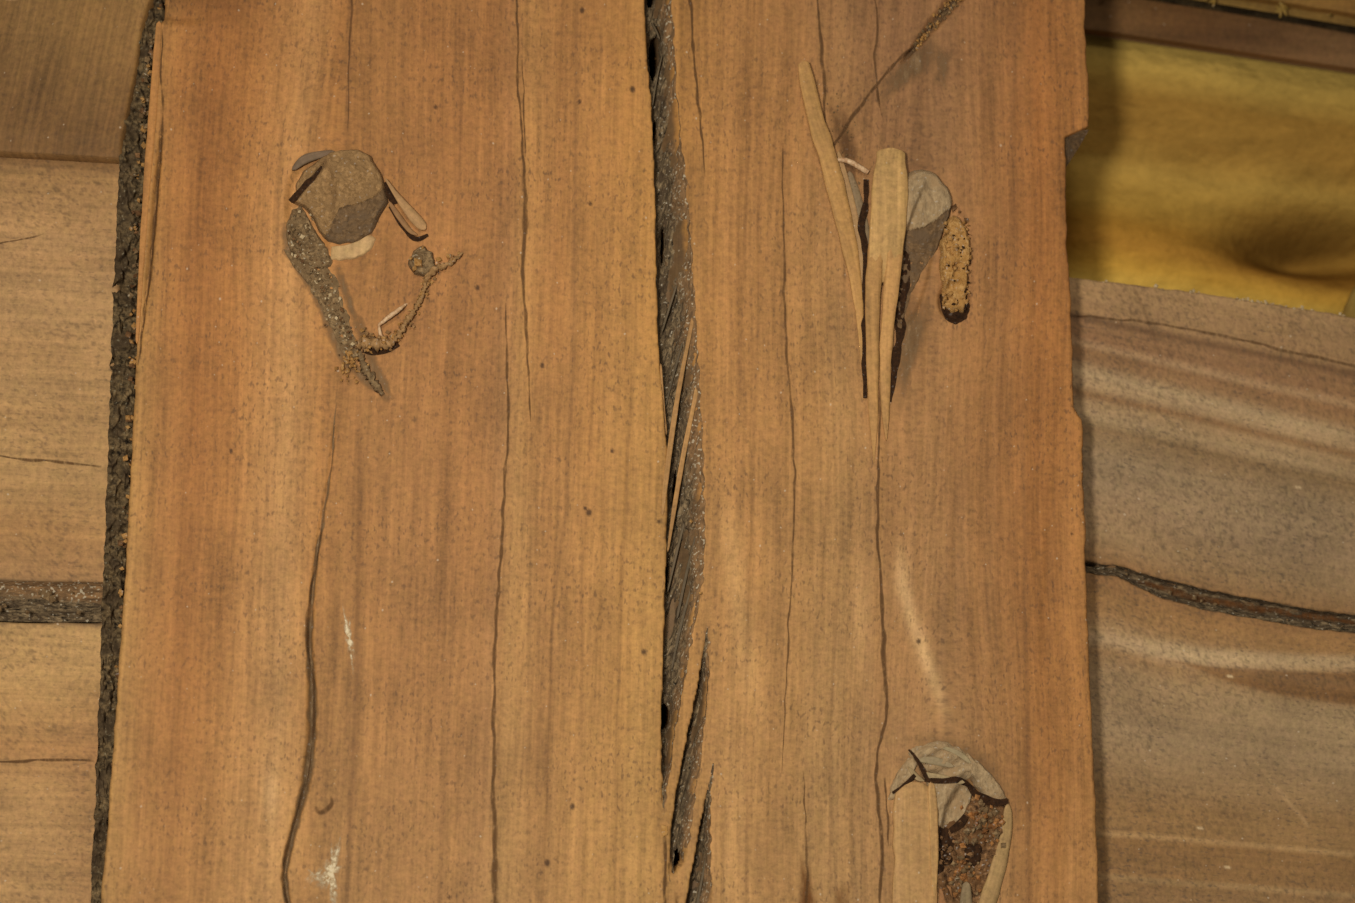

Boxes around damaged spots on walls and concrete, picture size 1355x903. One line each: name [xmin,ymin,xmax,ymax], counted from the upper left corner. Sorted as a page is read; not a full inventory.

crack [817,0,963,146]
peeling [292,150,335,171]
peeling [385,178,428,242]
crack [491,0,531,903]
crack [644,0,714,903]
crack [283,410,336,903]
crack [1085,562,1355,633]